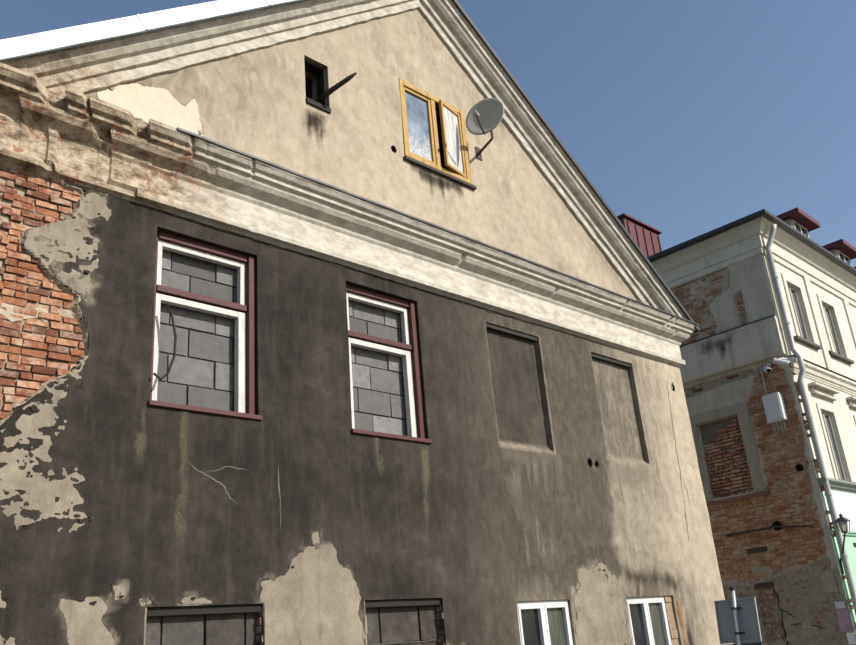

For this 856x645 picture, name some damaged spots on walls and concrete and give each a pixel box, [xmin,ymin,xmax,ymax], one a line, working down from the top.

peeling [97,81,203,136]
spalling [671,267,747,346]
spalling [0,167,112,533]
crack [186,461,248,503]
crack [275,467,283,523]
spalling [684,362,836,588]
peeling [59,583,125,645]
peeling [178,595,212,604]
peeling [260,532,364,645]